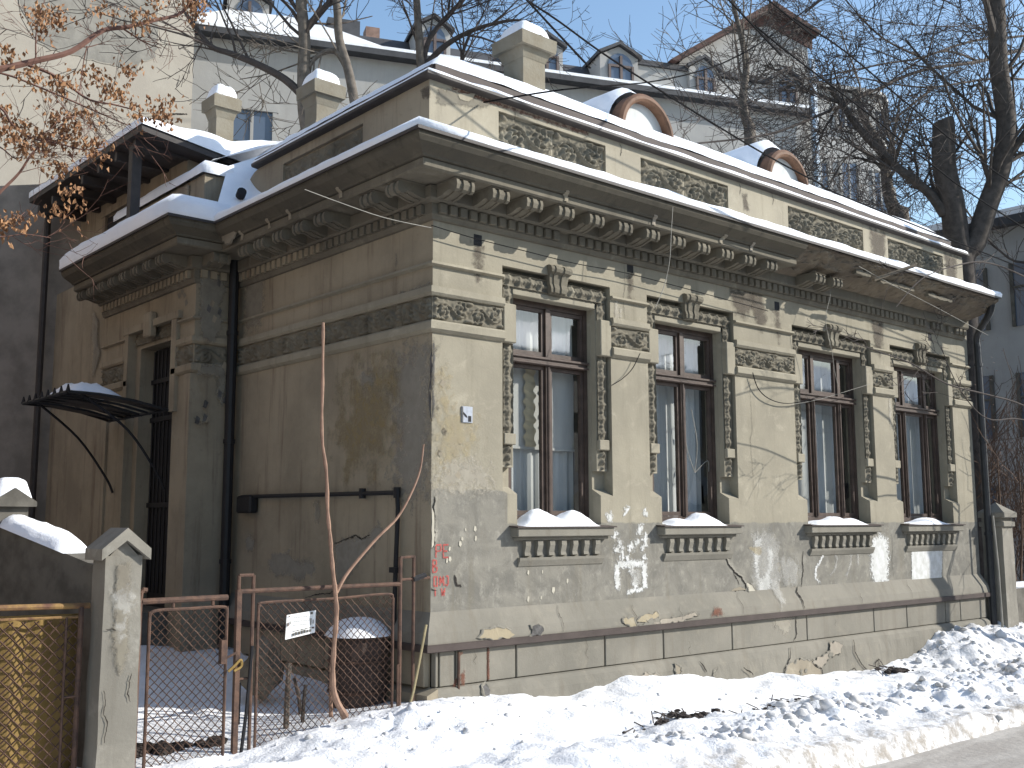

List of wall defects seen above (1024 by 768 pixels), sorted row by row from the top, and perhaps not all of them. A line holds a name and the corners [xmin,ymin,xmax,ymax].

damp [336,344,438,506]
crack [726,559,756,611]
crack [784,551,823,674]